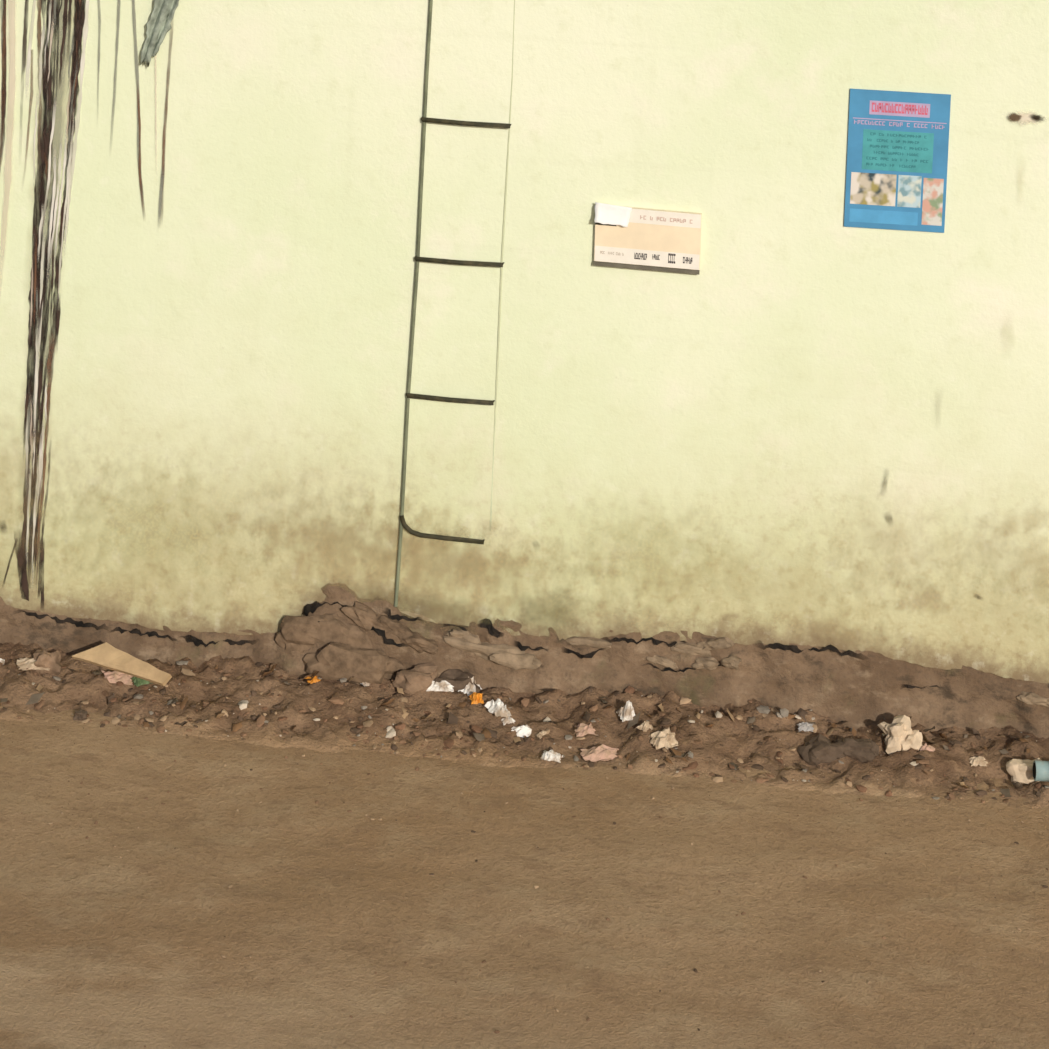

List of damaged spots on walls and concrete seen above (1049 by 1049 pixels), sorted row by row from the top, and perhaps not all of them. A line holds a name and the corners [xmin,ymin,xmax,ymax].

spalling [1009,113,1042,123]